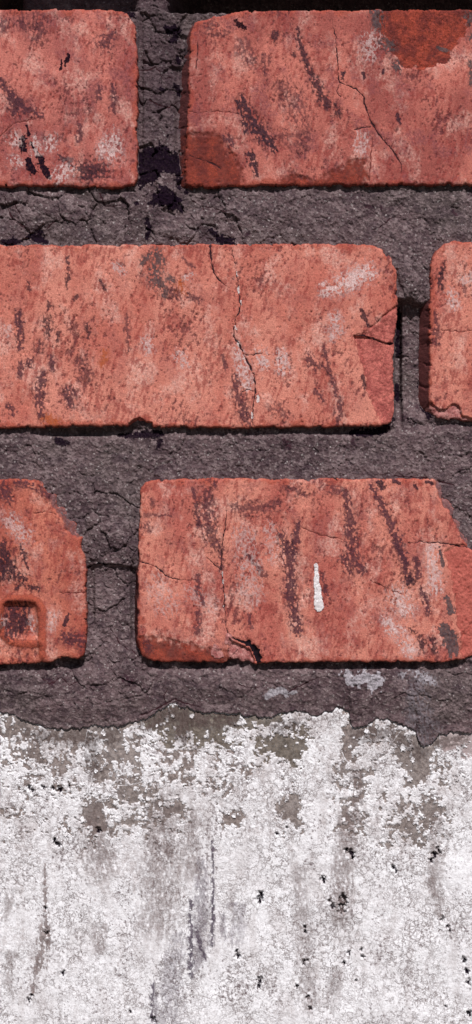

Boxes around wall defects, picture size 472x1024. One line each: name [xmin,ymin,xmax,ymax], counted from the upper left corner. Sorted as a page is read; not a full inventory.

crack [141,42,238,114]
crack [333,28,402,179]
crack [4,196,56,228]
crack [191,200,260,424]
crack [60,510,325,693]
damp [143,705,237,742]
damp [30,863,51,994]
damp [187,840,224,978]